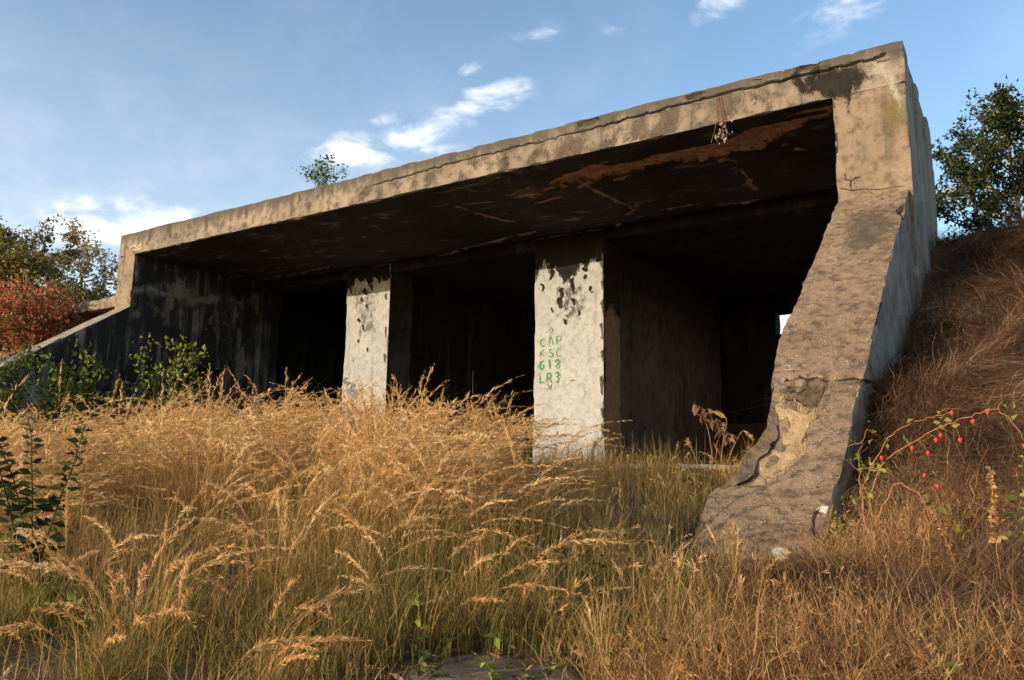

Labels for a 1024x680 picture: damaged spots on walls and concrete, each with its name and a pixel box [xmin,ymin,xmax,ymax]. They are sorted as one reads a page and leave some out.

crack [376,55,891,185]
leakage [791,63,898,112]
crack [841,174,906,195]
peeling [357,284,387,352]
peeling [540,260,621,462]
crack [772,375,884,394]
spalling [727,365,842,488]